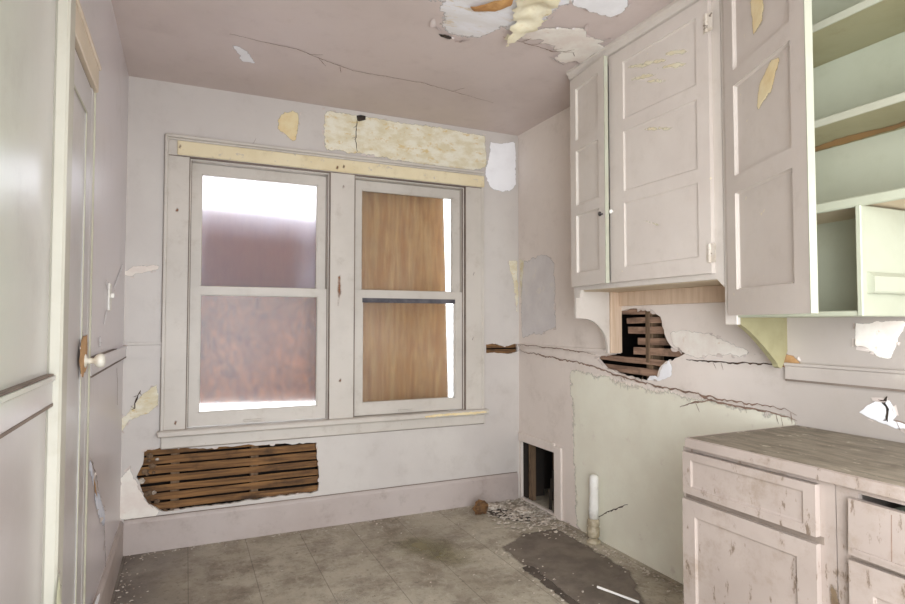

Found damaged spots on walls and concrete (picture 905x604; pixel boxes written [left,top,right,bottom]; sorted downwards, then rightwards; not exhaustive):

peeling [430,0,631,65]
peeling [278,111,301,141]
peeling [322,108,516,192]
peeling [852,321,905,359]
flaking render [120,443,319,522]
crack [521,344,795,425]
peeling [570,308,795,584]
flaking render [859,397,905,433]